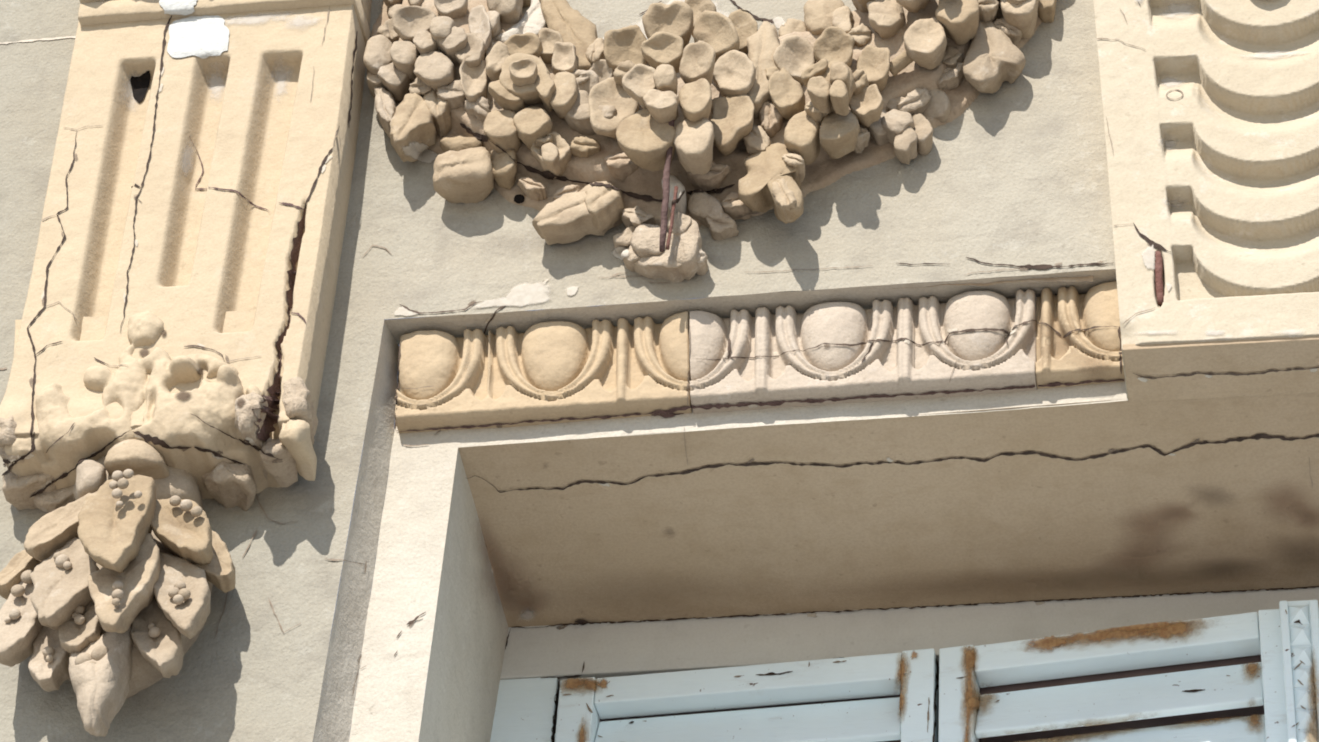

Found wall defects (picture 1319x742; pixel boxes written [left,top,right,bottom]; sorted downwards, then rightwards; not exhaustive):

crack [731,0,784,25]
crack [460,123,773,219]
crack [0,6,358,497]
crack [399,300,506,334]
spalling [475,283,549,308]
crack [395,307,1319,493]
corrosion [1028,621,1188,651]
corrosion [964,649,980,742]